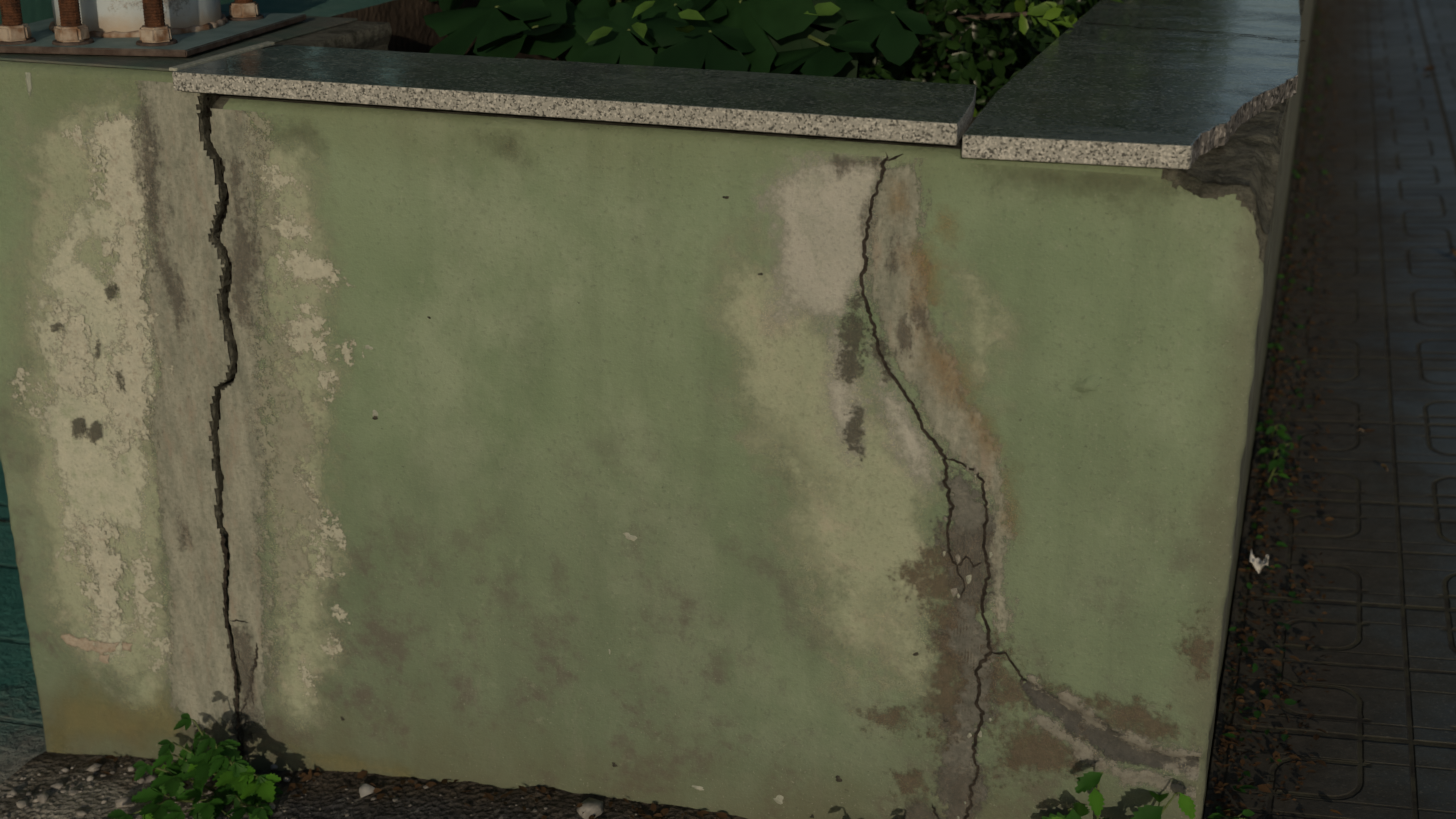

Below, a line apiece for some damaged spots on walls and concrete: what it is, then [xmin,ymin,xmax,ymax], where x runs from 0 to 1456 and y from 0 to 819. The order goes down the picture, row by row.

peeling [8,80,373,730]
crack [206,93,238,462]
crack [220,533,258,756]
crack [859,152,1024,819]
peeling [833,156,1202,819]
damp [858,547,1195,789]
spalling [1167,98,1289,259]